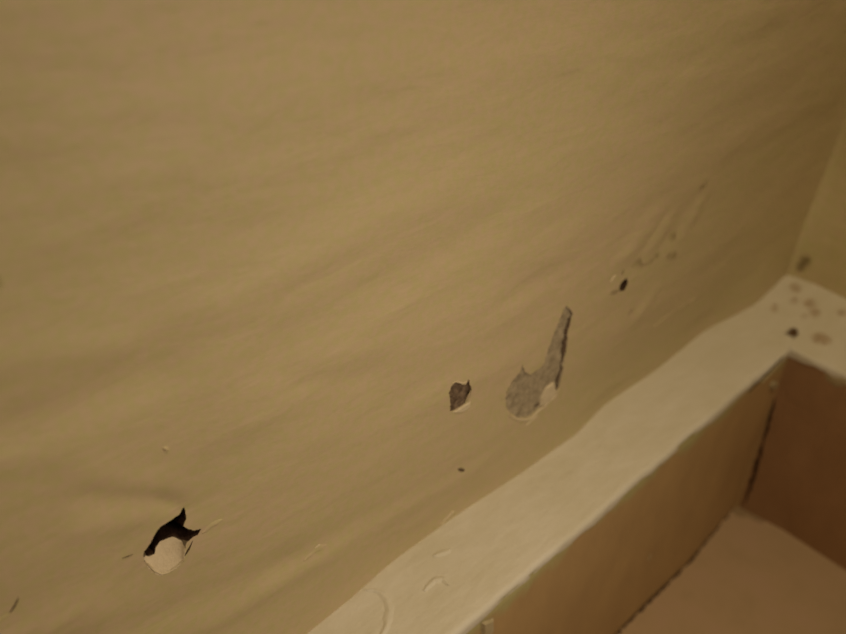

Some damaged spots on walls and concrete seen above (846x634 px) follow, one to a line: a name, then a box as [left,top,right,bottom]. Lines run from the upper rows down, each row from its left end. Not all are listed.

flaking render [449,380,472,413]
peeling [506,306,573,426]
flaking render [143,508,222,576]
crack [616,357,783,634]